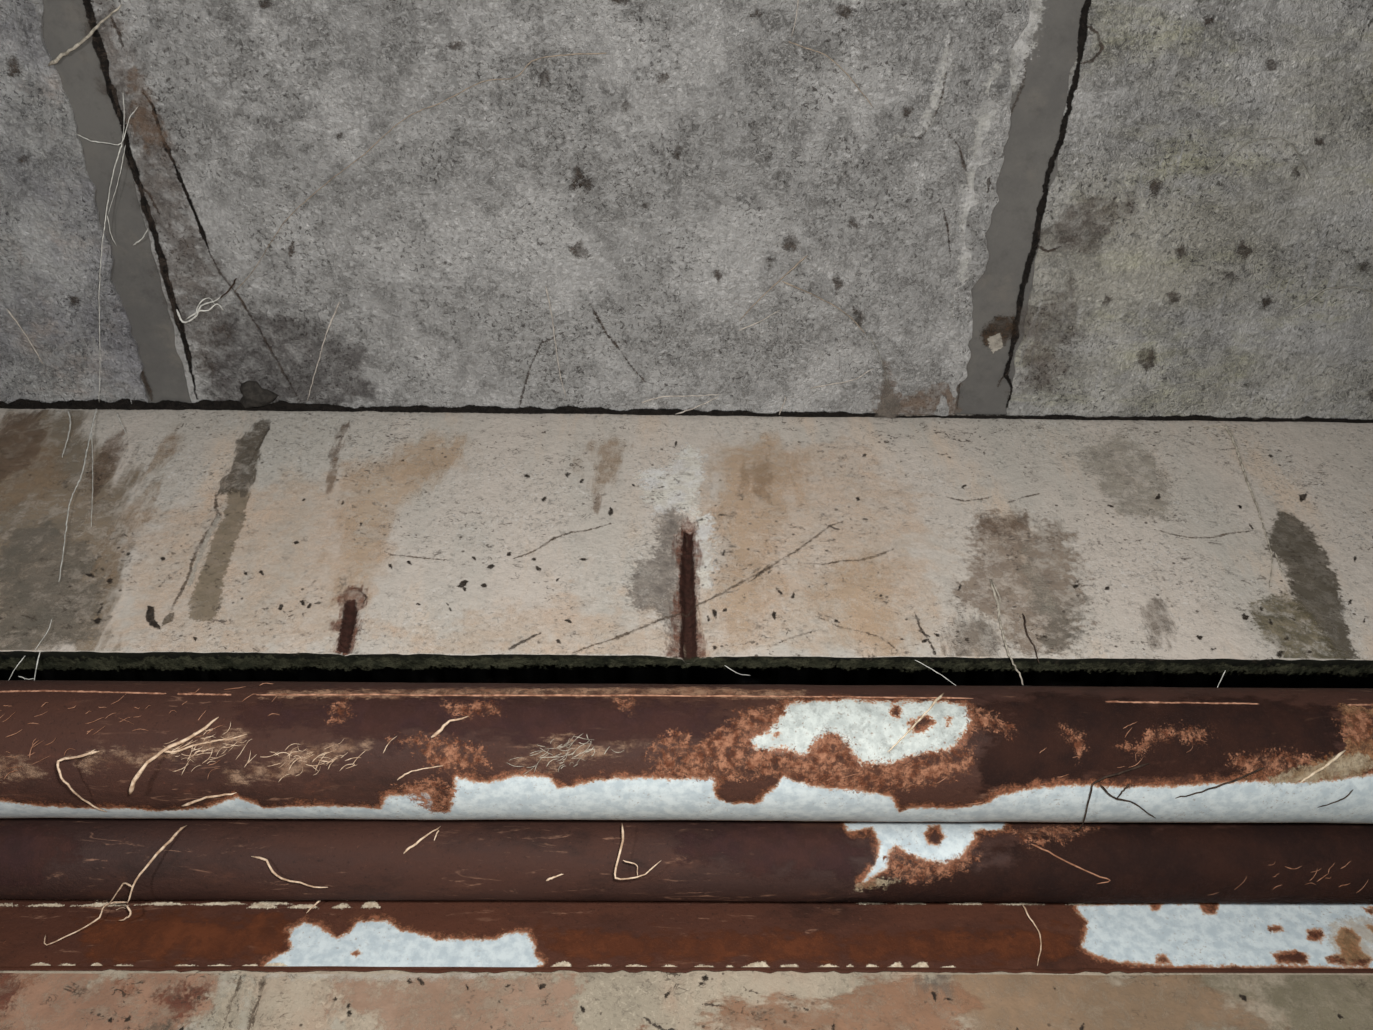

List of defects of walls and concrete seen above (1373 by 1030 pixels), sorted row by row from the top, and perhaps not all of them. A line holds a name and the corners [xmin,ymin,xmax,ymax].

crack [0,0,1373,462]
crack [170,492,222,614]
damp [0,410,1373,676]
damp [267,687,804,700]
peeling [0,693,1373,905]
rust [237,692,1373,814]
rust [823,823,1373,903]
peeling [695,961,797,985]
peeling [1065,902,1373,969]
damp [1198,975,1373,1030]